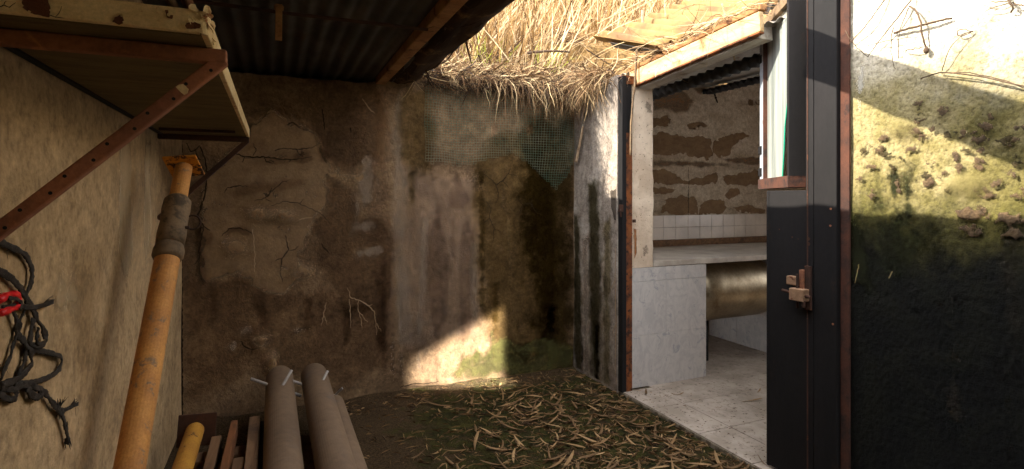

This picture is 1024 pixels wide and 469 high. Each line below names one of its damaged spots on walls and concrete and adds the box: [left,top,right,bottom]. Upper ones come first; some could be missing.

crack [181,109,330,415]
damp [517,117,601,379]
peeling [653,114,765,215]